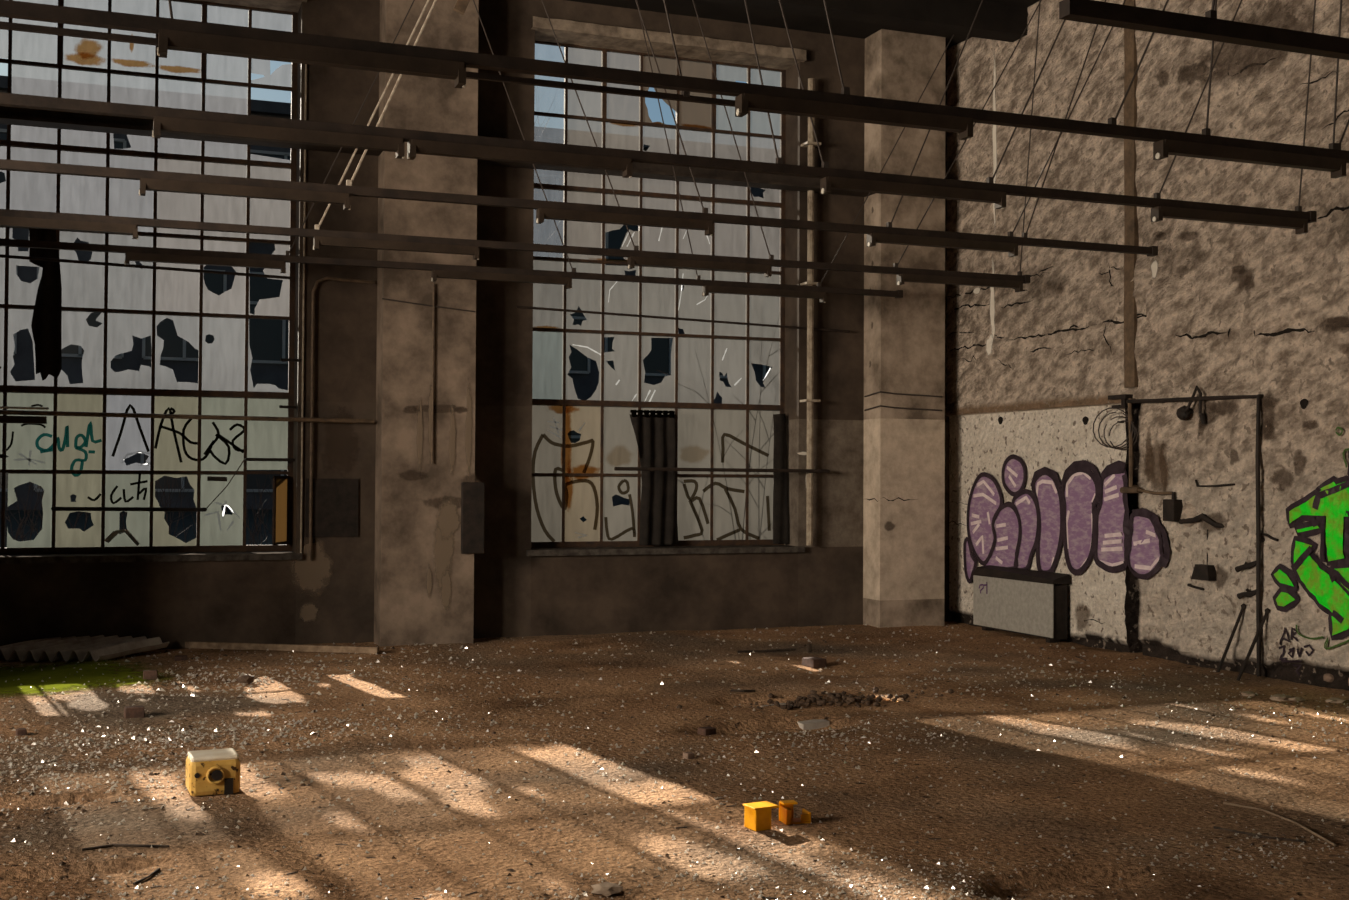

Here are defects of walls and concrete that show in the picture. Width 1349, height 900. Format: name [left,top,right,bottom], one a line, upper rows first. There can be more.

crack [1317,206,1349,219]
crack [947,266,1147,368]
leakage [1322,317,1349,332]
crack [1176,328,1314,339]